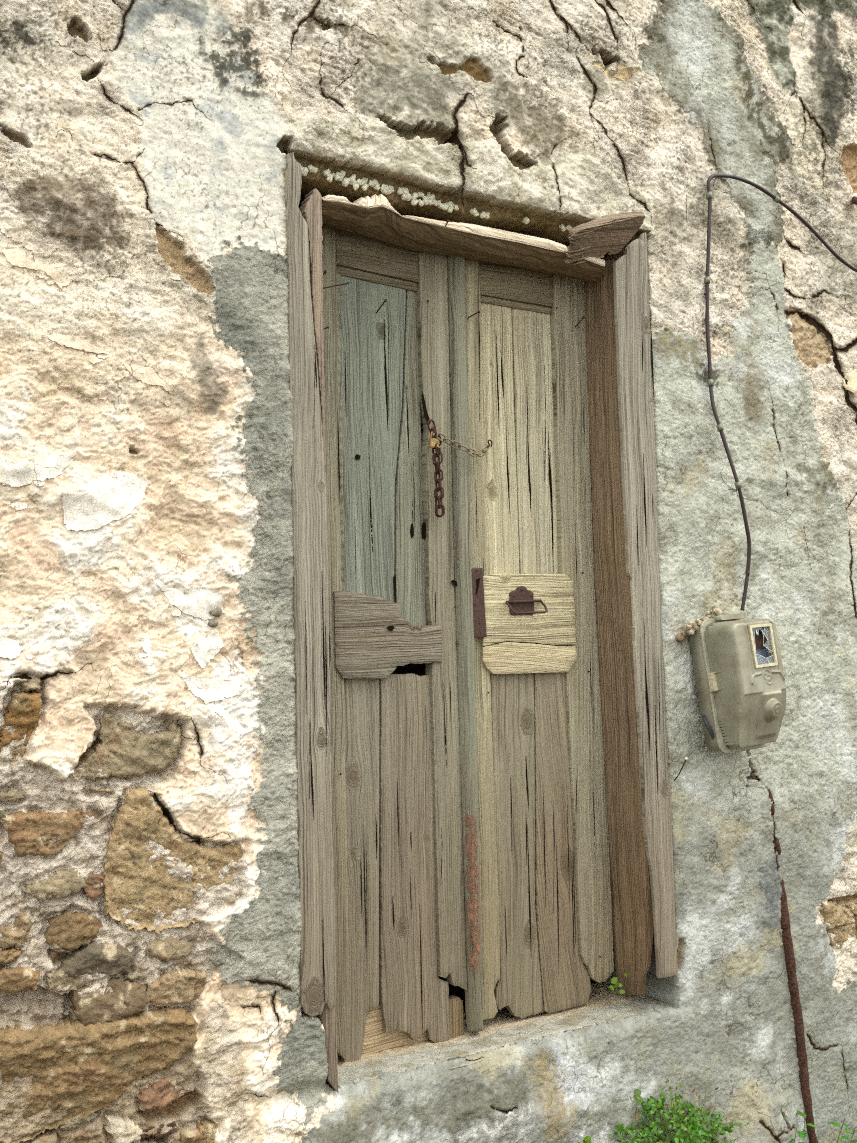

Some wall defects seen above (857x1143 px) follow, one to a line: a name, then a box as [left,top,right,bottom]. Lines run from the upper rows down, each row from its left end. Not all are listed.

crack [61,0,210,249]
crack [283,0,387,129]
crack [446,93,477,207]
crack [470,8,527,78]
crack [517,139,565,216]
crack [550,0,652,223]
leakage [809,14,851,136]
spalling [841,147,857,193]
crack [739,229,857,422]
spalling [786,307,831,368]
crack [846,494,857,617]
crack [2,663,92,690]